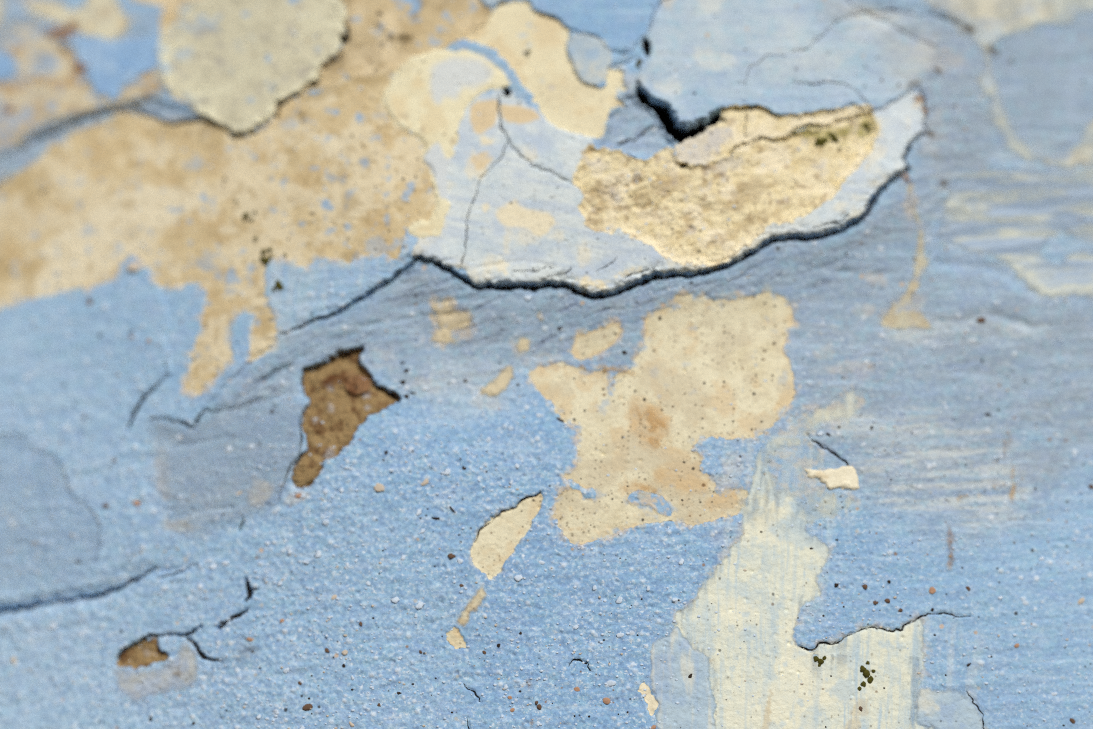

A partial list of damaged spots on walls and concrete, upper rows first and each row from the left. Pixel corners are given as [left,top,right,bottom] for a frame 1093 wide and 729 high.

crack [18,24,350,151]
peeling [0,0,720,396]
crack [282,0,972,334]
crack [127,350,362,501]
spalling [292,348,401,488]
crack [374,386,400,403]
peeling [446,290,986,729]
crack [807,434,849,466]
crack [0,563,199,614]
spalling [116,637,197,700]
crack [799,612,971,651]